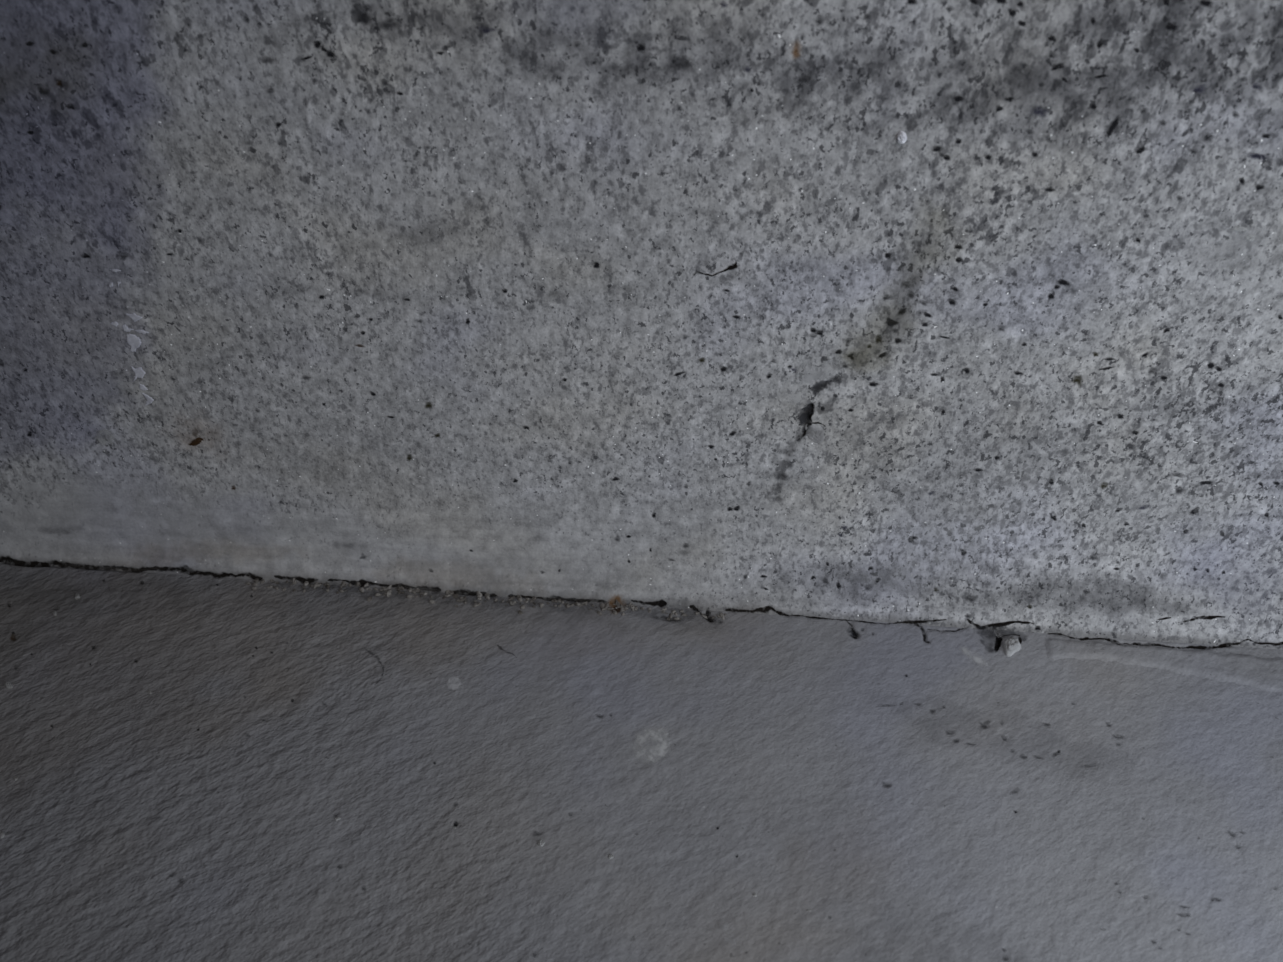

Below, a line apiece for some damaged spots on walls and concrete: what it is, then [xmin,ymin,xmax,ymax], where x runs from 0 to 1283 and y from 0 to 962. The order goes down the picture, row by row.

crack [0,557,1283,649]